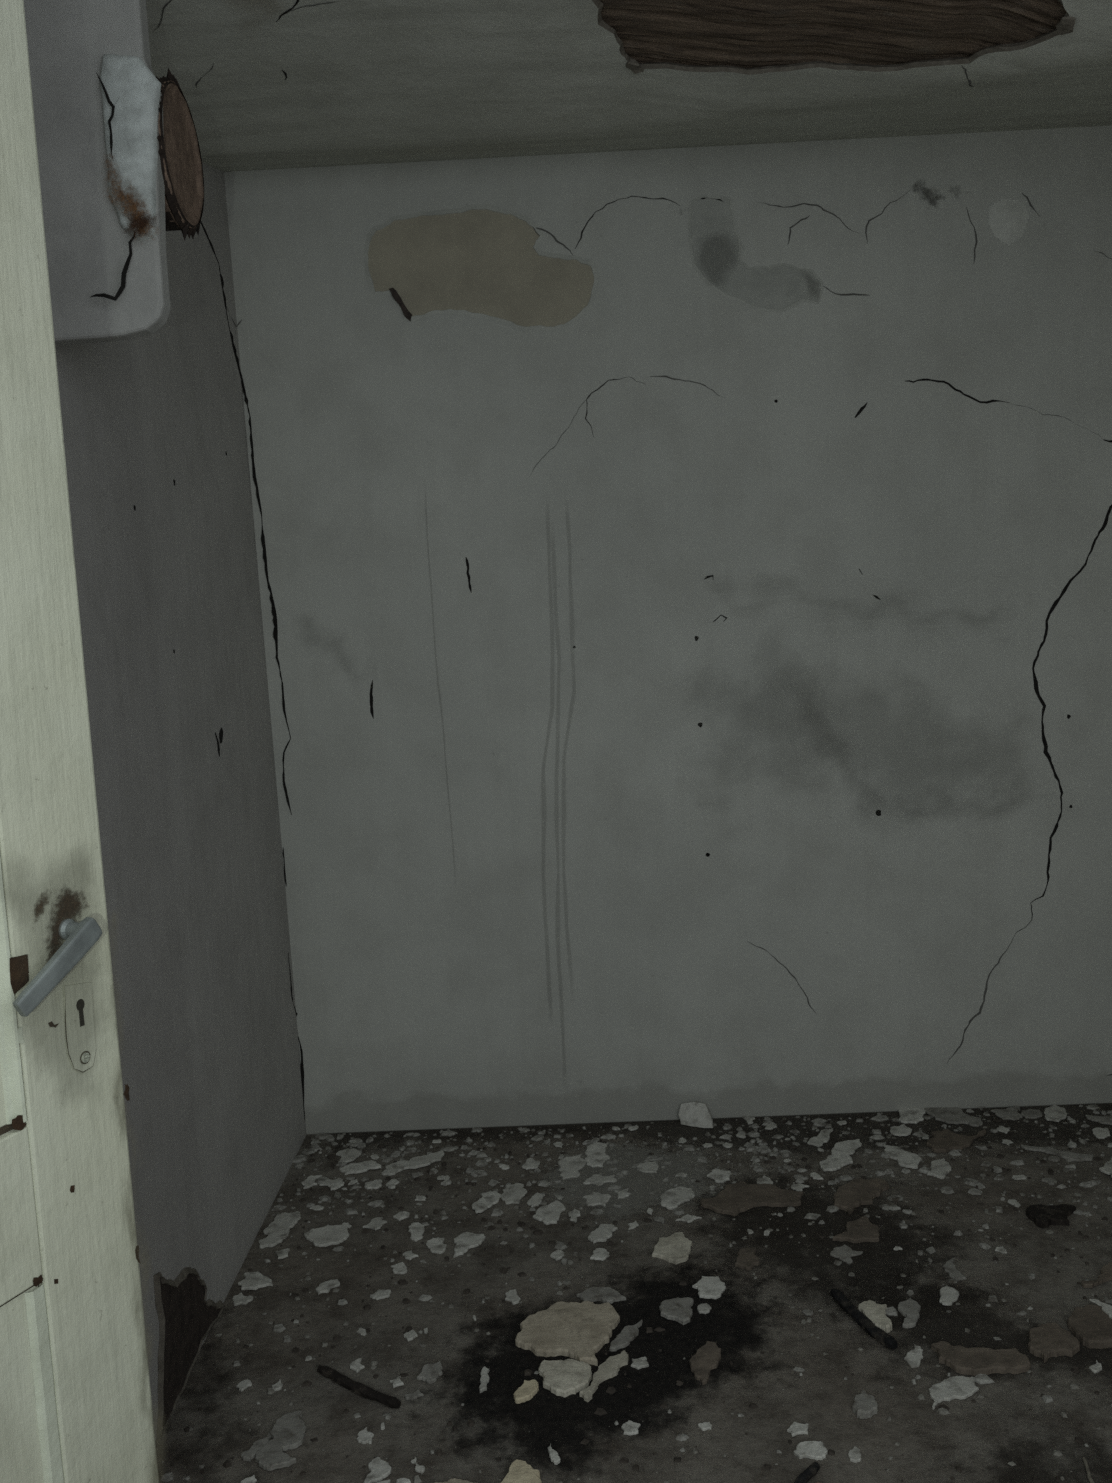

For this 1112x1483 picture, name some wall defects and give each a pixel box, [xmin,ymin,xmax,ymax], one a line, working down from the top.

crack [276,0,340,22]
spalling [592,0,1075,75]
crack [96,72,119,159]
crack [575,196,721,249]
crack [765,191,909,244]
crack [91,234,135,301]
crack [824,286,867,296]
crack [529,375,720,478]
crack [907,379,1112,443]
crack [201,221,292,885]
crack [947,505,1112,1063]
crack [288,953,305,1119]